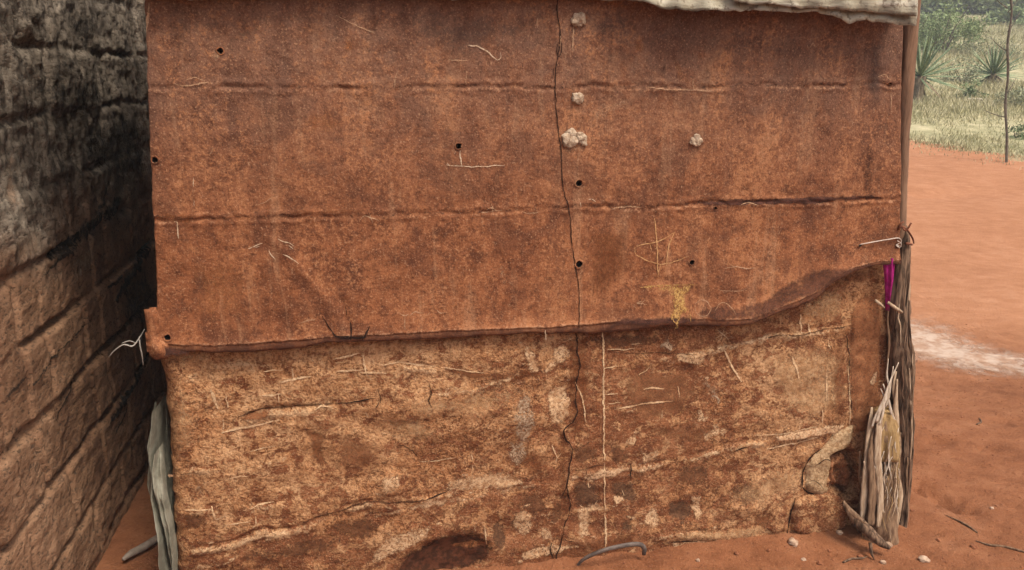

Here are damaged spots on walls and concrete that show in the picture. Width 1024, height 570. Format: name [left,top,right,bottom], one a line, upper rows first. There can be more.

corrosion [685,149,878,205]
crack [550,0,604,559]
corrosion [614,269,875,331]
peeling [191,369,659,568]